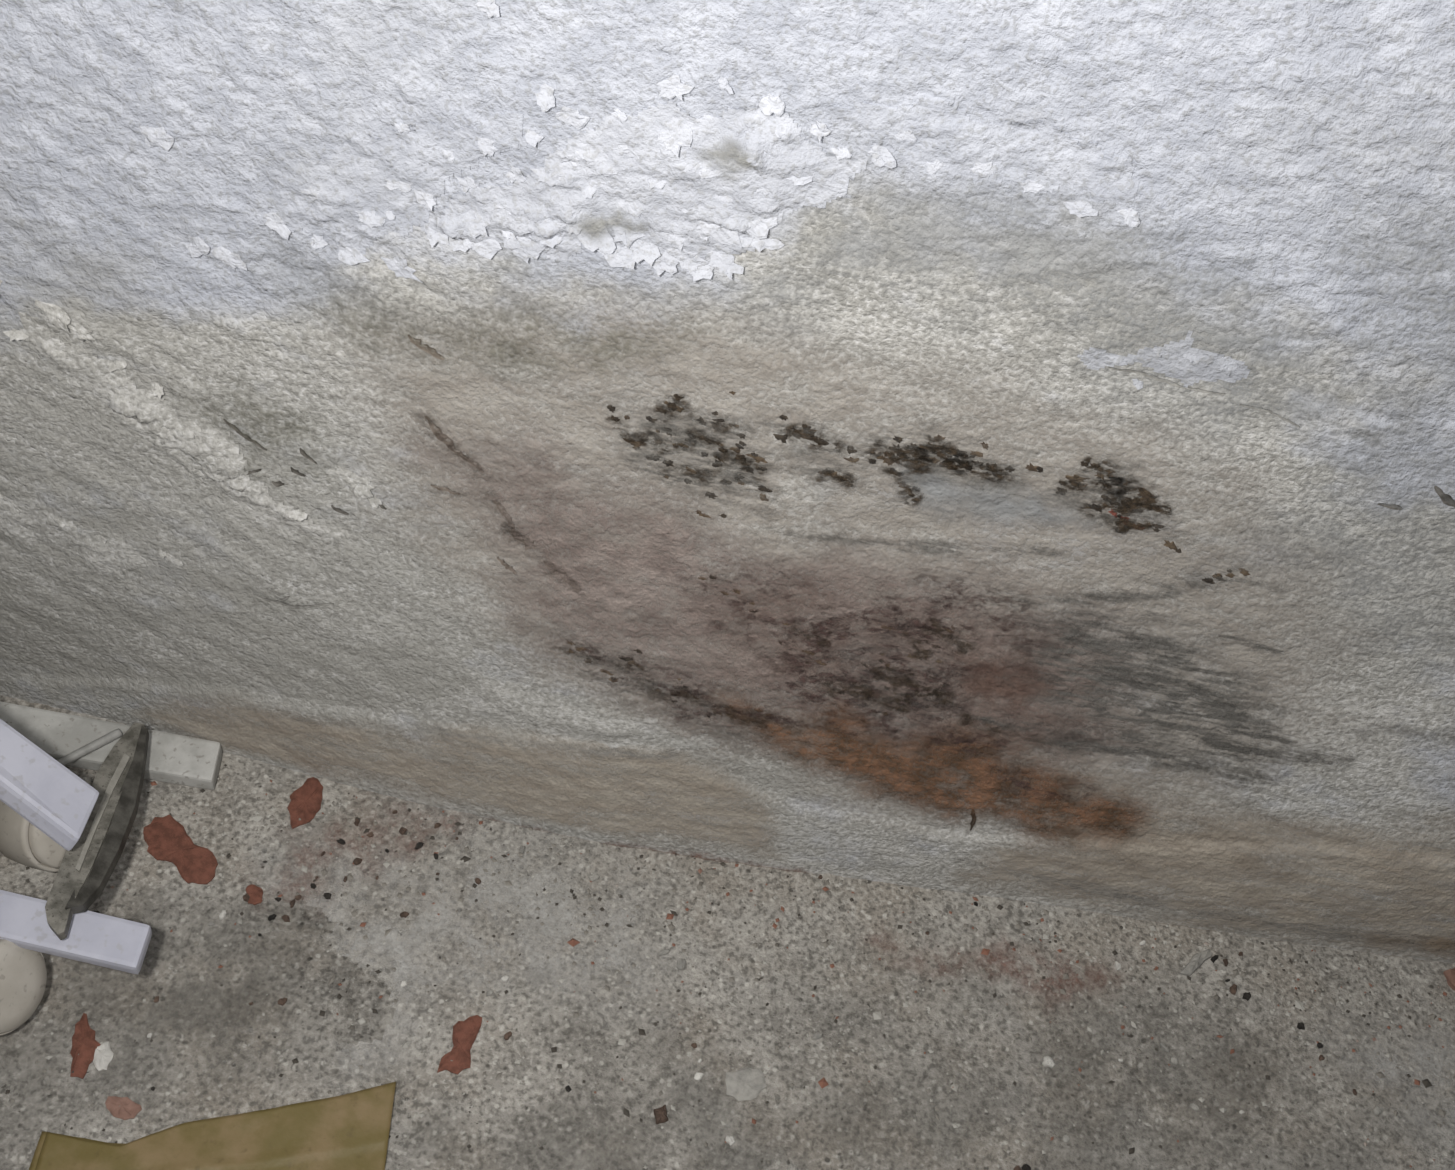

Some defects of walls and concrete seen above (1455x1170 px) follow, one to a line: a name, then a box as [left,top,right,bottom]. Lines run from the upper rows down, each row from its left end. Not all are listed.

water stain [393,329,1353,799]
corrosion [738,711,1270,869]